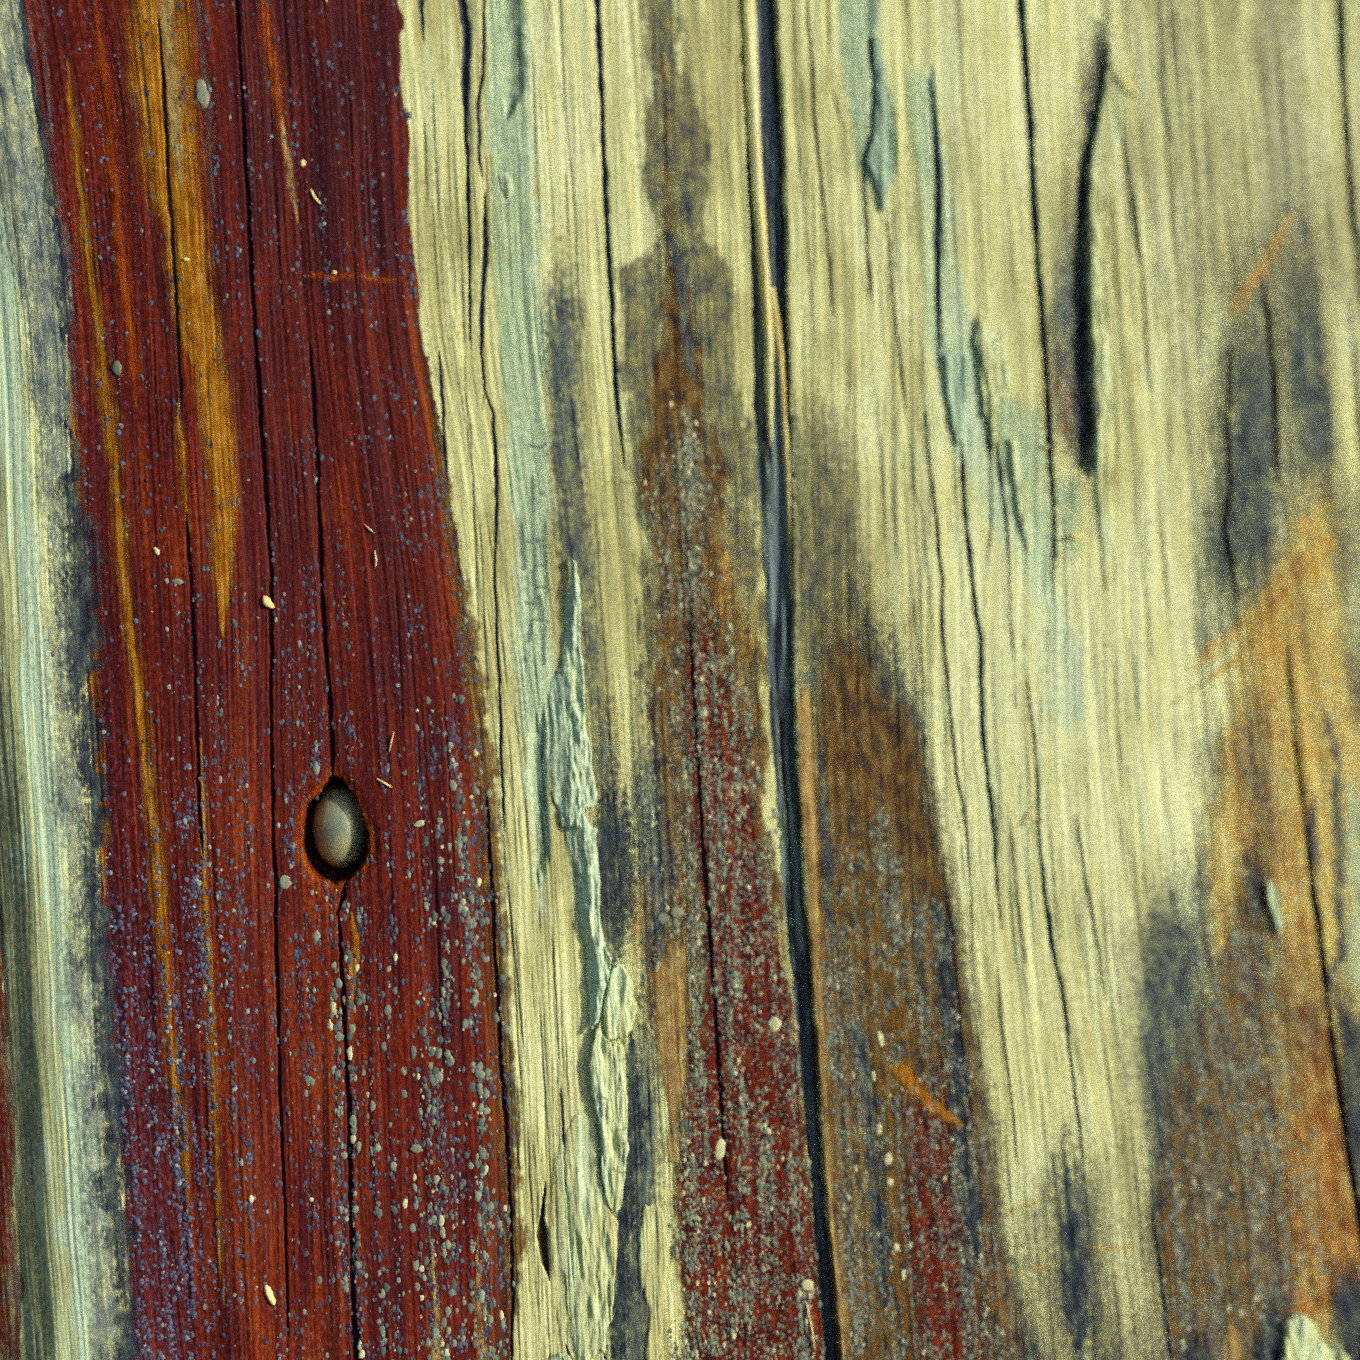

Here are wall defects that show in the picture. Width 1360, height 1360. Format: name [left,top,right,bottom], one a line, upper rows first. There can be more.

peeling [24,0,528,1360]
peeling [489,0,637,1360]
crack [594,0,623,461]
peeling [638,1205,669,1360]
crack [807,0,833,313]
leakage [541,0,1125,1360]
crack [862,0,1083,1157]
leakage [1138,246,1360,1360]
crack [1262,283,1277,485]
crack [1335,0,1360,440]